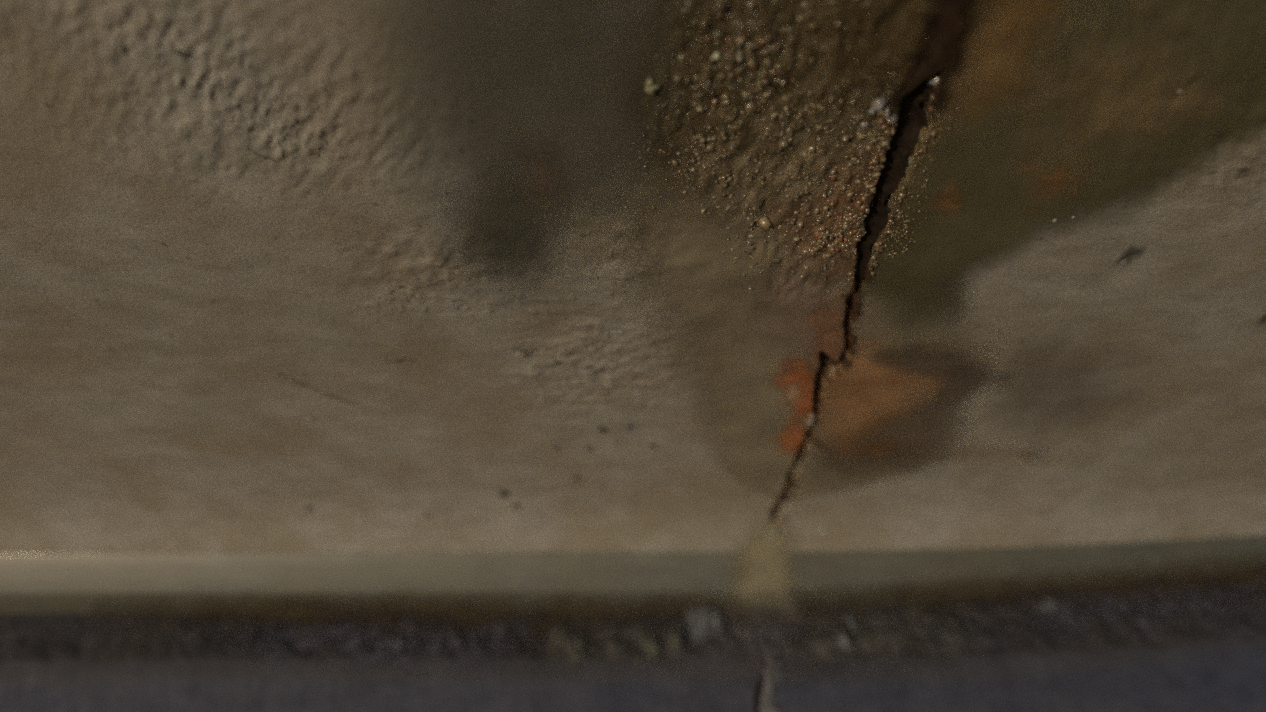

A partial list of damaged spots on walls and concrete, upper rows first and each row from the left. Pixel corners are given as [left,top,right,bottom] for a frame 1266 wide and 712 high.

spalling [608,0,912,298]
corrosion [779,311,845,451]
crack [767,0,972,524]